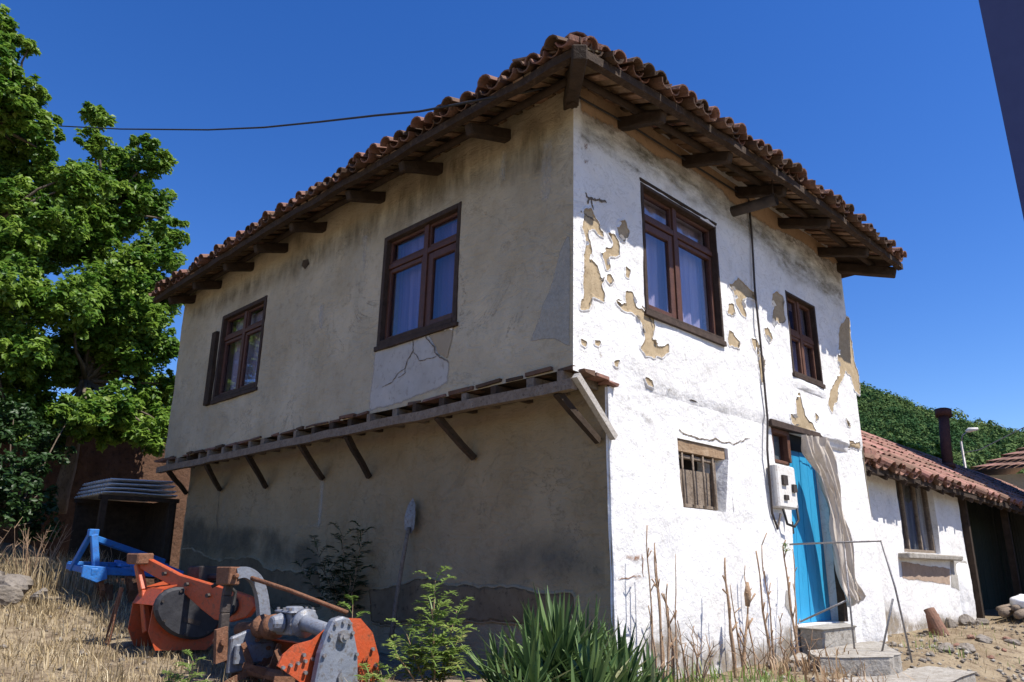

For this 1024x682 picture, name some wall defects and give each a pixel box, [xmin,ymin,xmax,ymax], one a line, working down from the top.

crack [385,336,448,386]
peeling [578,206,670,361]
crack [679,429,750,445]
peeling [726,276,786,385]
peeling [789,316,861,451]